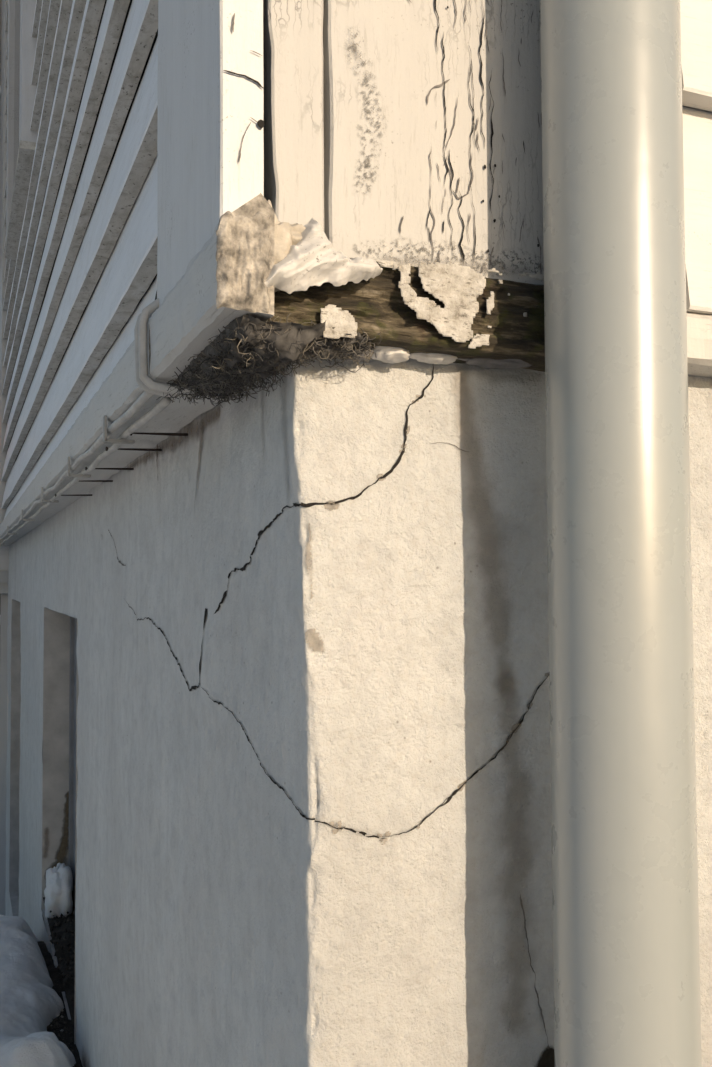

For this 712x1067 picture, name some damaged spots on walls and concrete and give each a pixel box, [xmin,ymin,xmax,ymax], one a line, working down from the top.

water stain [351,36,381,186]
crack [399,0,542,281]
peeling [320,304,358,339]
peeling [373,259,510,349]
crack [127,366,549,844]
peeling [536,1046,555,1067]